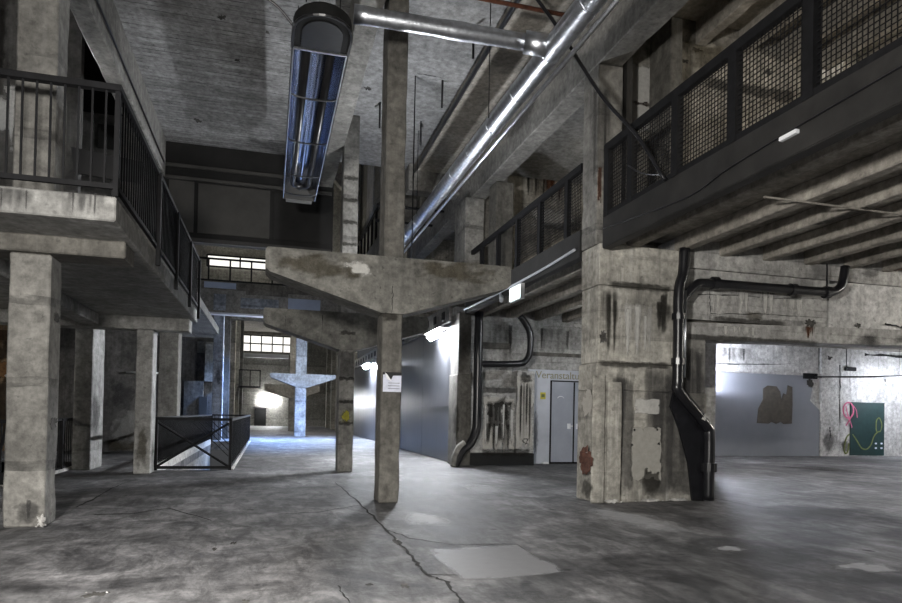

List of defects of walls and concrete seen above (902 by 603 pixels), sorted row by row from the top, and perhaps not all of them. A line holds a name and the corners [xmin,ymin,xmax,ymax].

crack [287,482,465,603]